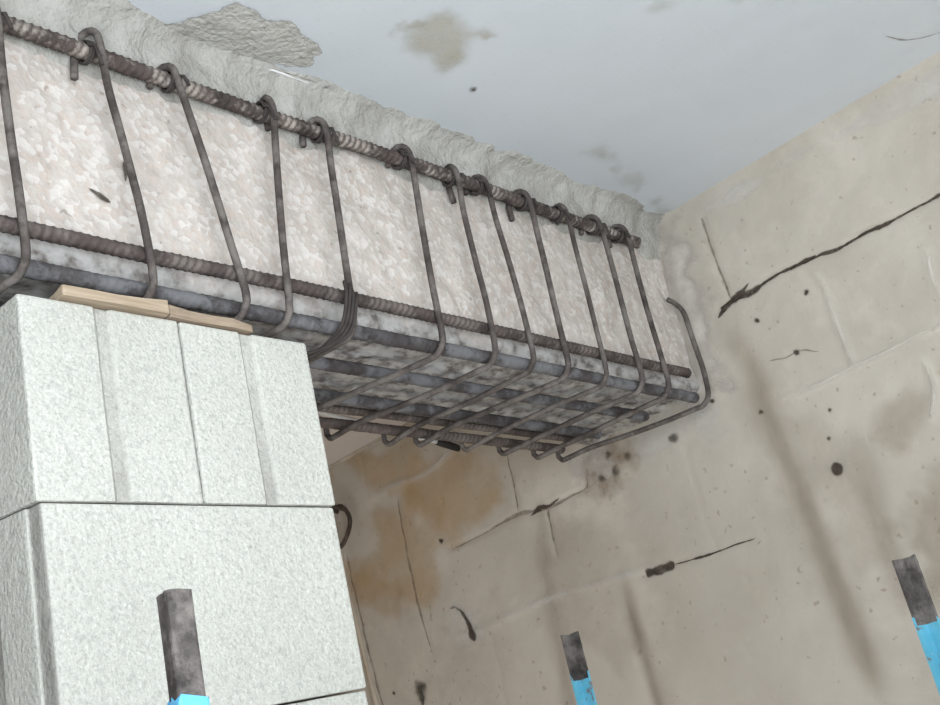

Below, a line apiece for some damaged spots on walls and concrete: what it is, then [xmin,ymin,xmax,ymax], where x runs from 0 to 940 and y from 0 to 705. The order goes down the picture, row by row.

peeling [164,3,322,83]
crack [718,193,940,318]
spalling [596,449,630,482]
crack [645,538,755,577]